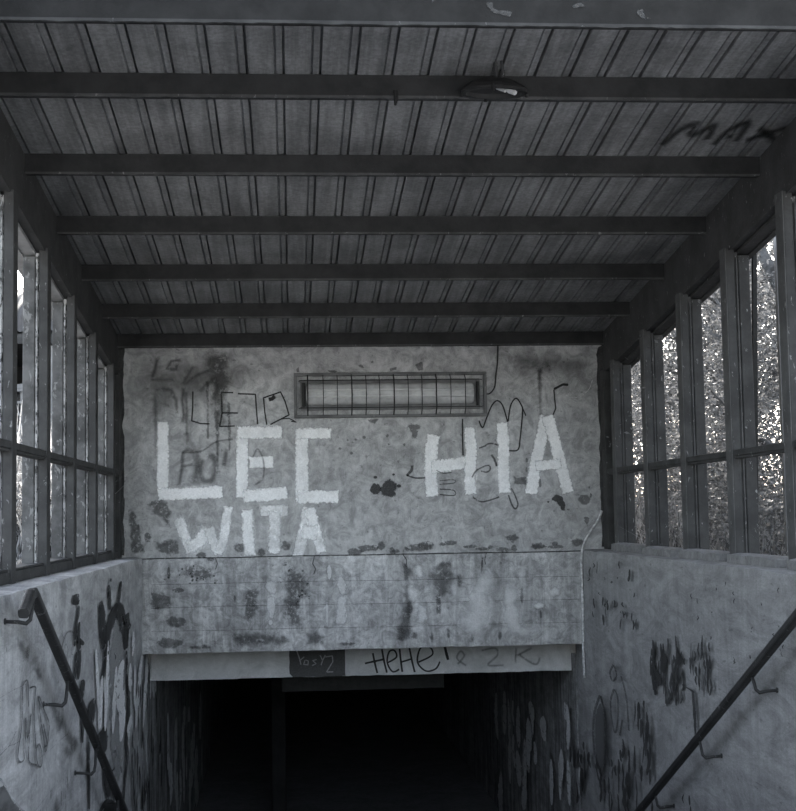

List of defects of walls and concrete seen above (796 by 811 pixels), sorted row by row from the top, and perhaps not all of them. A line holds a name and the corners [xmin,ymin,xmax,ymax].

leakage [235,633,288,644]
leakage [266,581,276,625]
leakage [326,565,346,626]
leakage [397,601,426,639]
leakage [432,563,461,613]
leakage [462,577,492,640]
leakage [504,588,534,635]
spalling [0,785,21,811]